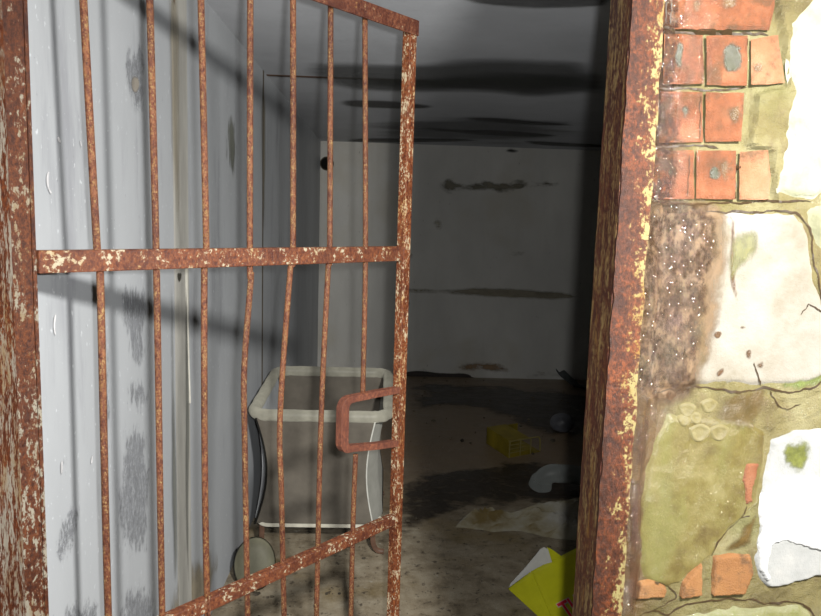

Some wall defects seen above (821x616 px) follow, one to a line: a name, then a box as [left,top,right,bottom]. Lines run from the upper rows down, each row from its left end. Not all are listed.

leakage [324,66,402,90]
leakage [415,63,593,94]
spalling [652,0,785,200]
leakage [414,118,601,147]
leakage [444,180,524,191]
leakage [124,293,144,359]
crack [658,363,821,409]
peeling [679,428,821,599]
rust [630,481,642,611]
crack [640,582,815,616]